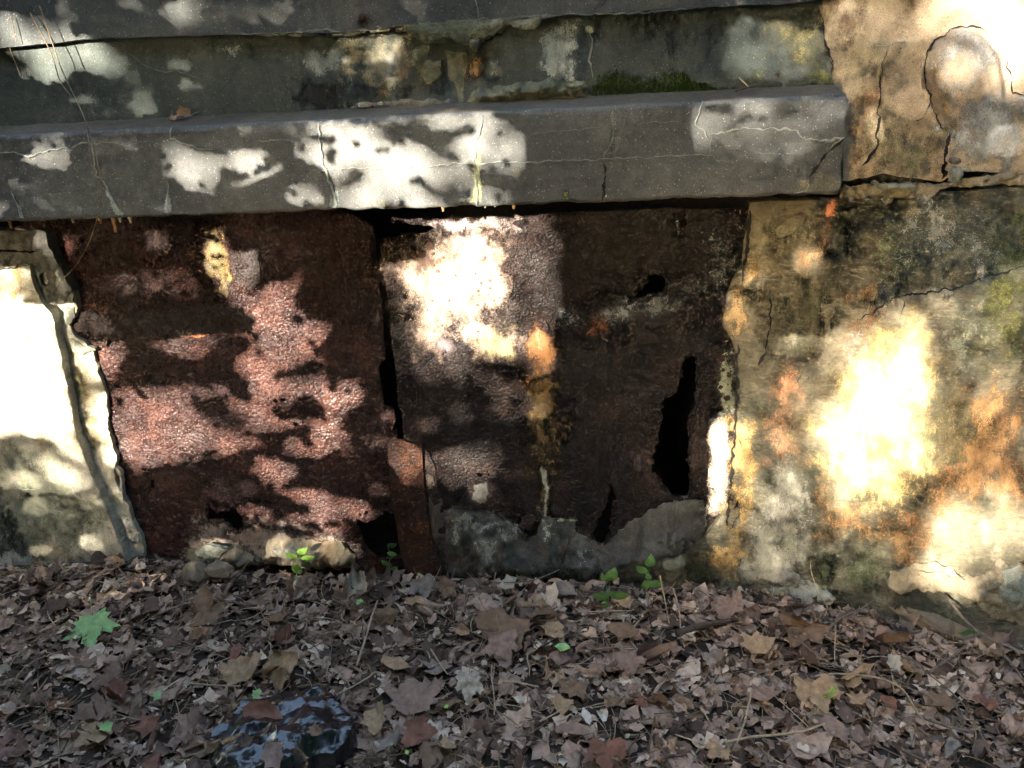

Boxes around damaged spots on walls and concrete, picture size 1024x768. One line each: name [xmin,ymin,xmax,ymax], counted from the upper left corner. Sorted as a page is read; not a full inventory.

crack [238,100,848,208]
crack [862,25,1023,179]
rust [378,241,441,270]
rust [436,338,453,354]
rust [724,255,764,336]
rust [521,324,567,513]
rust [807,284,1024,566]